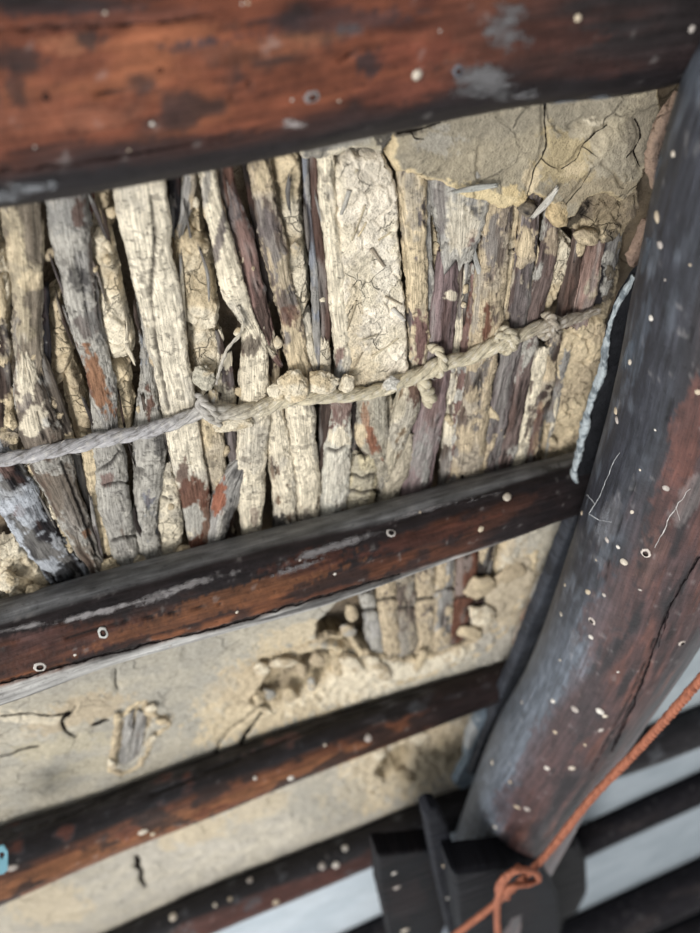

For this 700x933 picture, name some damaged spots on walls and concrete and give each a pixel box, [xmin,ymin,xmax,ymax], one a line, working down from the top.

crack [396,123,440,140]
crack [526,104,607,205]
crack [626,118,641,167]
spalling [241,550,542,716]
crack [612,556,700,751]
crack [0,746,40,757]
crack [0,706,109,738]
spalling [107,700,172,777]
crack [215,704,274,752]